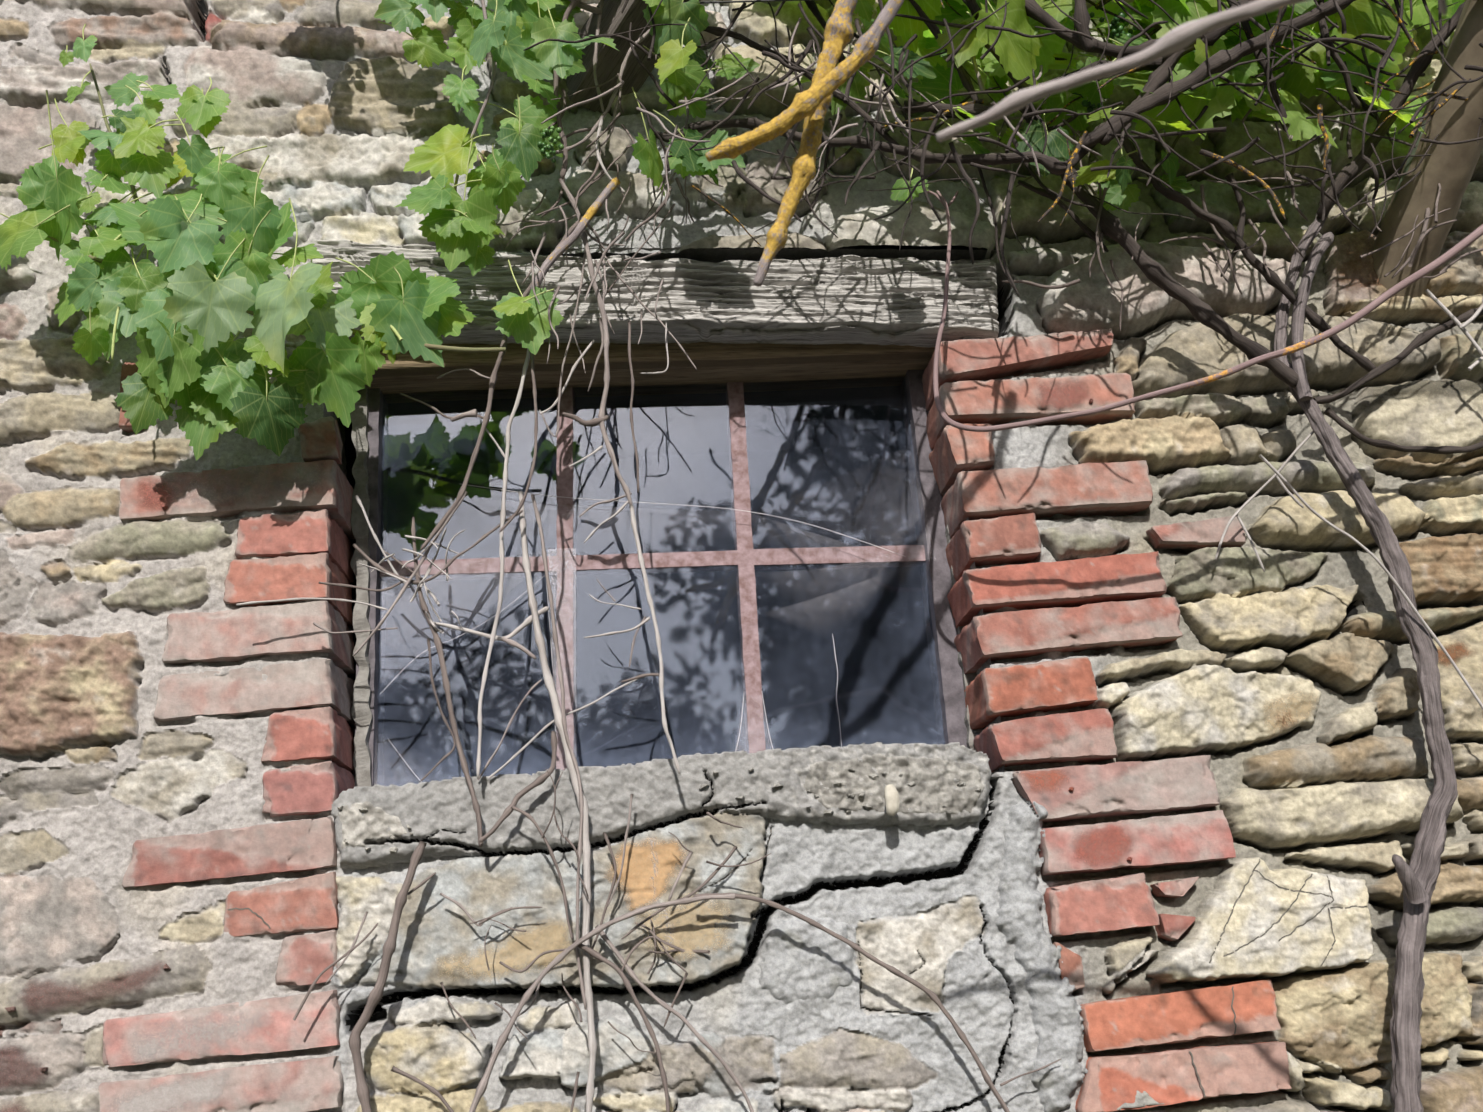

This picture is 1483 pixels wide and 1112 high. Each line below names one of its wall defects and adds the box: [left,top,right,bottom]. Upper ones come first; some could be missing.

crack [364,770,995,1016]
crack [933,906,1015,1112]